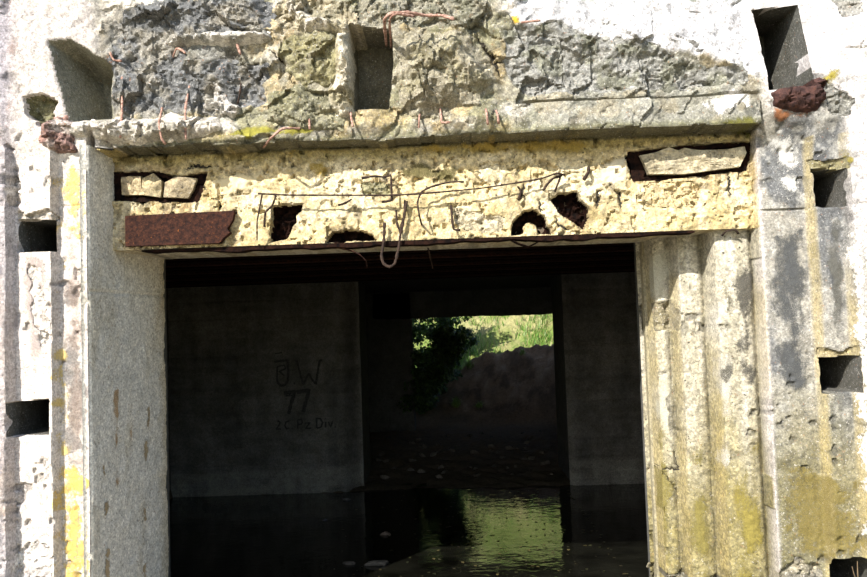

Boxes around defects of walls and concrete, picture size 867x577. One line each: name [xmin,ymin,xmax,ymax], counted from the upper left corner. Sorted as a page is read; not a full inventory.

corrosion [38,115,78,154]
spalling [106,0,492,148]
spalling [502,19,749,97]
corrosion [770,77,827,128]
water stain [656,213,853,540]